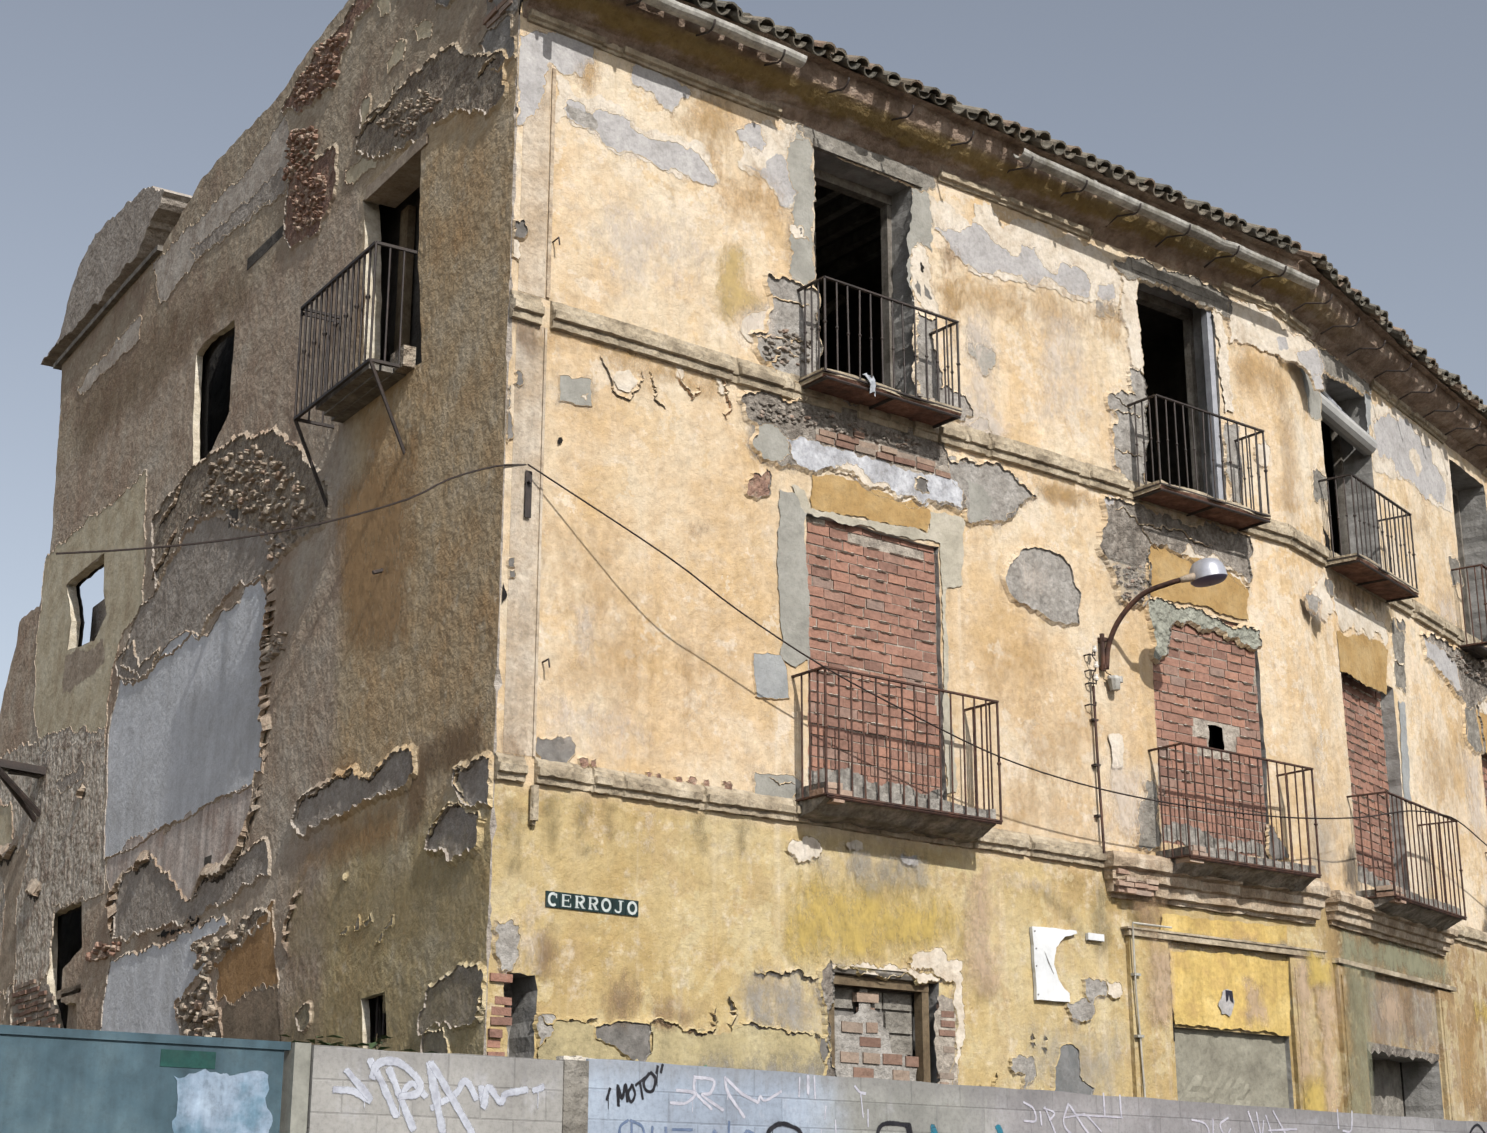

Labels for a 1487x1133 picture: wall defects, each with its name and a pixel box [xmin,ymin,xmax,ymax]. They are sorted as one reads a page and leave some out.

spalling [151,0,720,305]
spalling [735,120,1037,532]
peeling [864,167,1452,665]
peeling [0,424,332,1041]
spalling [290,743,419,842]
spalling [424,750,494,870]
peeling [784,835,823,865]
peeling [1303,572,1487,801]
peeling [417,917,521,1056]
peeling [532,946,966,1085]
spalling [991,1033,1095,1095]
peeling [1064,976,1123,1024]